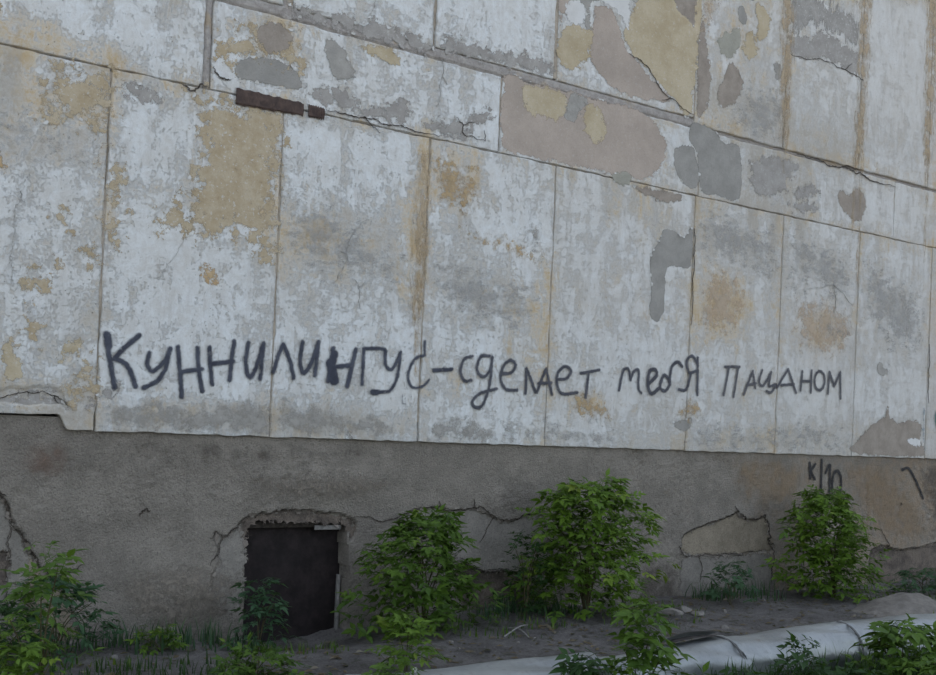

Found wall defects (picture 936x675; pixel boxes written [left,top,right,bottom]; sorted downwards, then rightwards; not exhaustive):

spalling [788,0,862,77]
crack [791,54,864,81]
peeling [148,0,821,265]
peeling [649,227,693,322]
peeling [849,406,925,457]
crack [0,491,85,633]
crack [353,500,524,541]
spalling [679,513,775,596]
spalling [868,542,936,584]